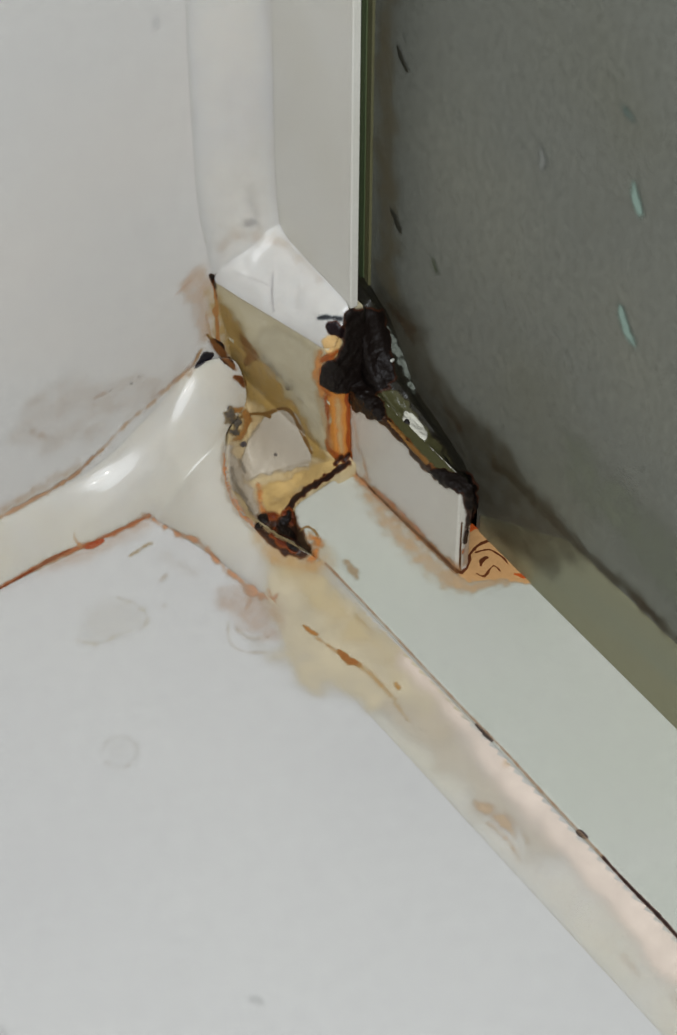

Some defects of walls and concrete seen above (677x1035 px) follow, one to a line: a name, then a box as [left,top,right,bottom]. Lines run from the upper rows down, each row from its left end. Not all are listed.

peeling [240,407,312,480]
corrosion [257,335,352,516]
corrosion [0,514,277,601]
corrosion [265,526,324,572]
corrosion [344,560,358,578]
corrosion [353,472,530,592]
corrosion [303,625,401,690]
damp [255,508,677,983]